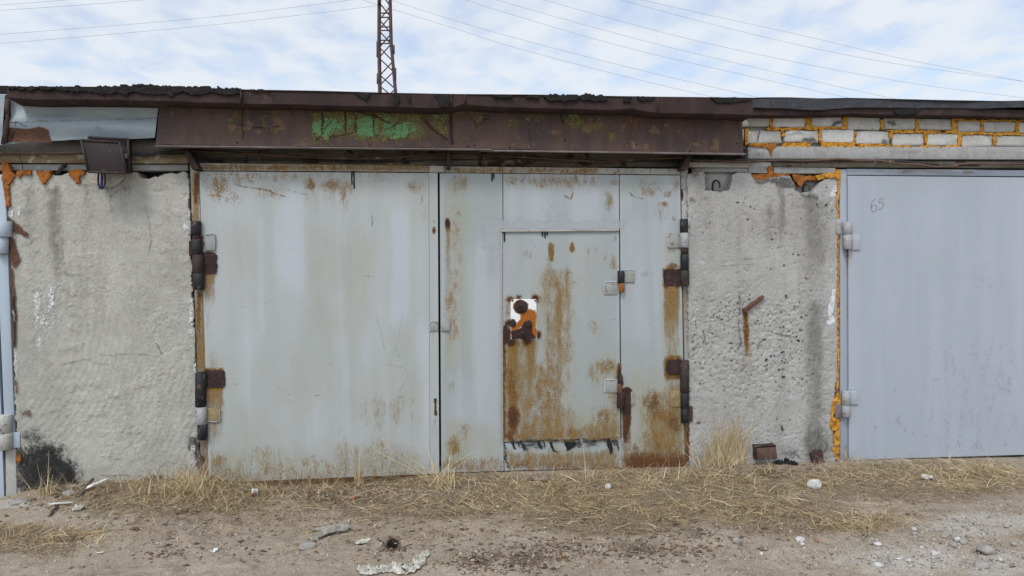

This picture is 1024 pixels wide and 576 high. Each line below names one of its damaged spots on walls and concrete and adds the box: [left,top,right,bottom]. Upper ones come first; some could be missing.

corrosion [192,163,430,221]
spalling [755,175,833,211]
corrosion [195,273,223,372]
corrosion [432,208,462,340]
corrosion [444,244,690,473]
spalling [692,277,820,407]